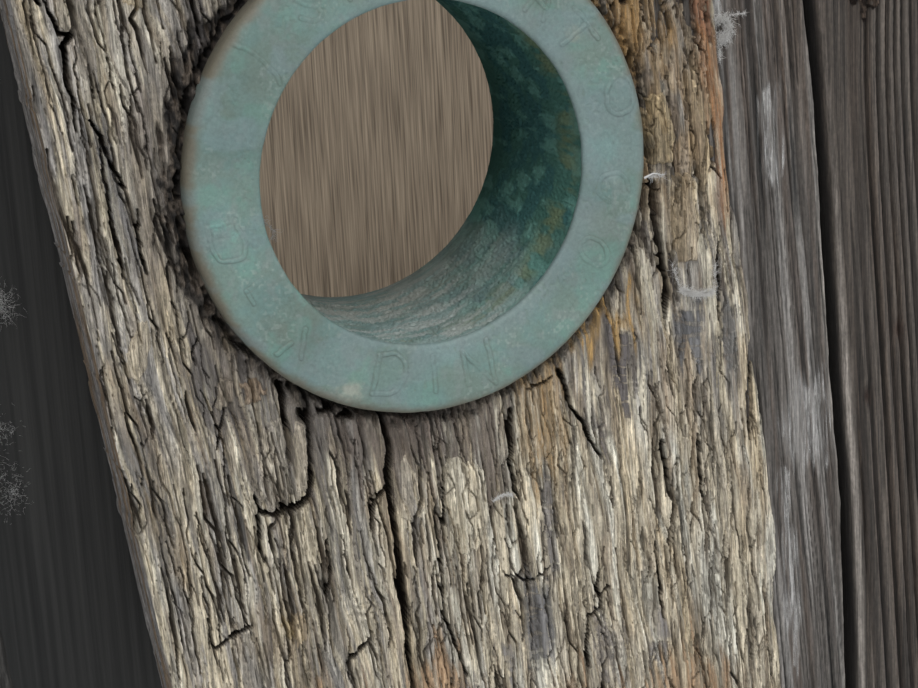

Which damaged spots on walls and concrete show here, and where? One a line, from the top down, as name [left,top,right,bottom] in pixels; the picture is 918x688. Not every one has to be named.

crack [34,0,146,279]
crack [253,379,414,688]
crack [504,407,518,494]
crack [525,367,600,458]